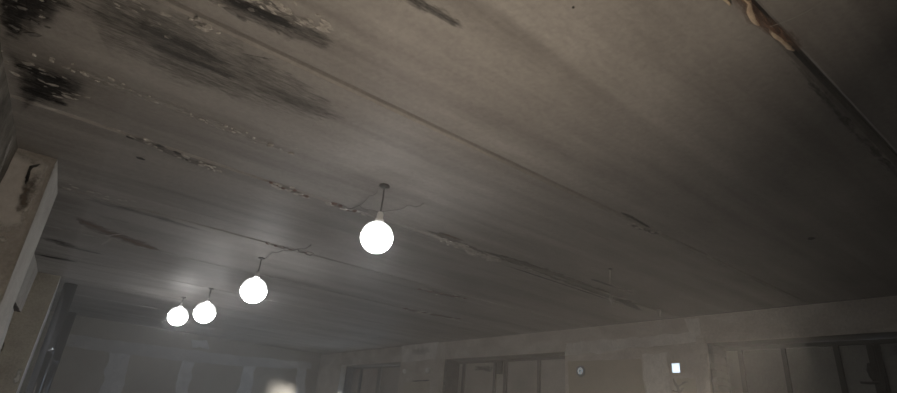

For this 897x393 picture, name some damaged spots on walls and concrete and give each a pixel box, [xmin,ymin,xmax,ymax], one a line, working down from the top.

damp [0,0,70,37]
damp [410,0,459,26]
damp [1,50,90,106]
damp [83,0,334,112]